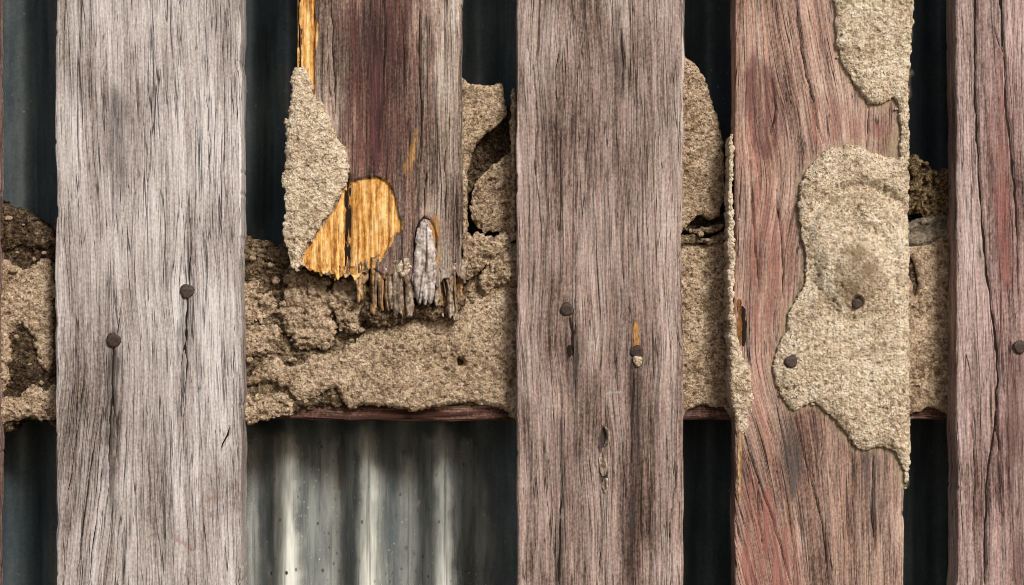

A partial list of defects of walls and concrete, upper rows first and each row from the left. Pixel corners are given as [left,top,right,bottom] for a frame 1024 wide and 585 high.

crack [971,0,1019,584]